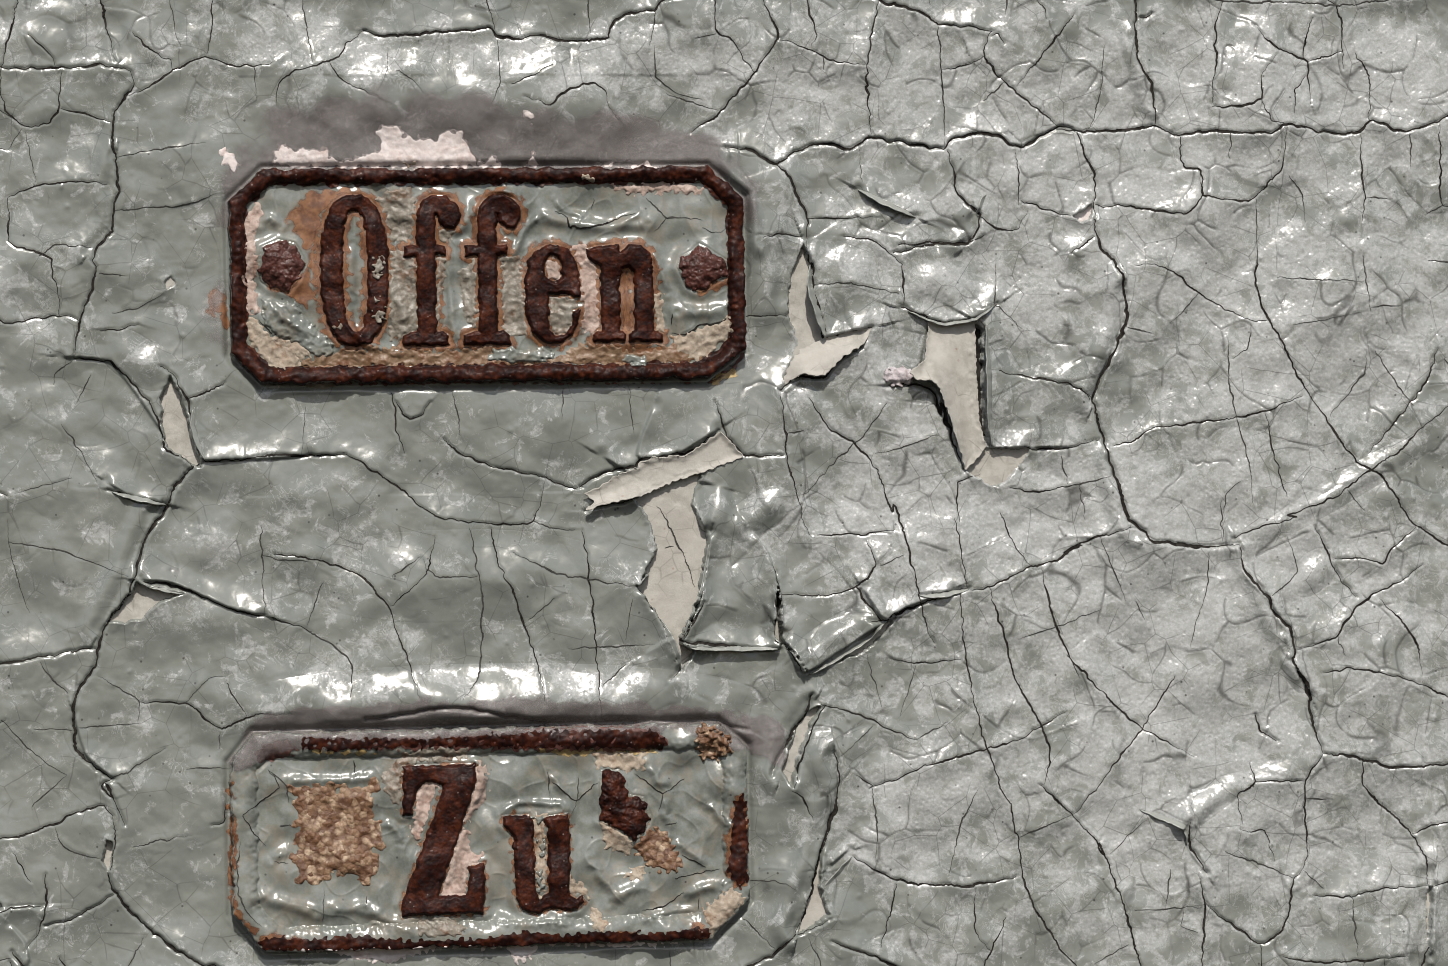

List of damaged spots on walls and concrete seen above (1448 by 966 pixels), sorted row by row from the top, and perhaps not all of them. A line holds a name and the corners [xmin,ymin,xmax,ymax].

peeling [219,147,237,172]
corrosion [267,186,669,386]
crack [0,0,946,966]
corrosion [220,94,727,224]
peeling [241,125,733,390]
peeling [584,432,782,670]
corrosion [684,352,744,385]
corrosion [742,185,755,219]
peeling [783,249,872,385]
peeling [883,320,1028,486]
crack [725,0,1448,966]
corrosion [225,696,787,951]